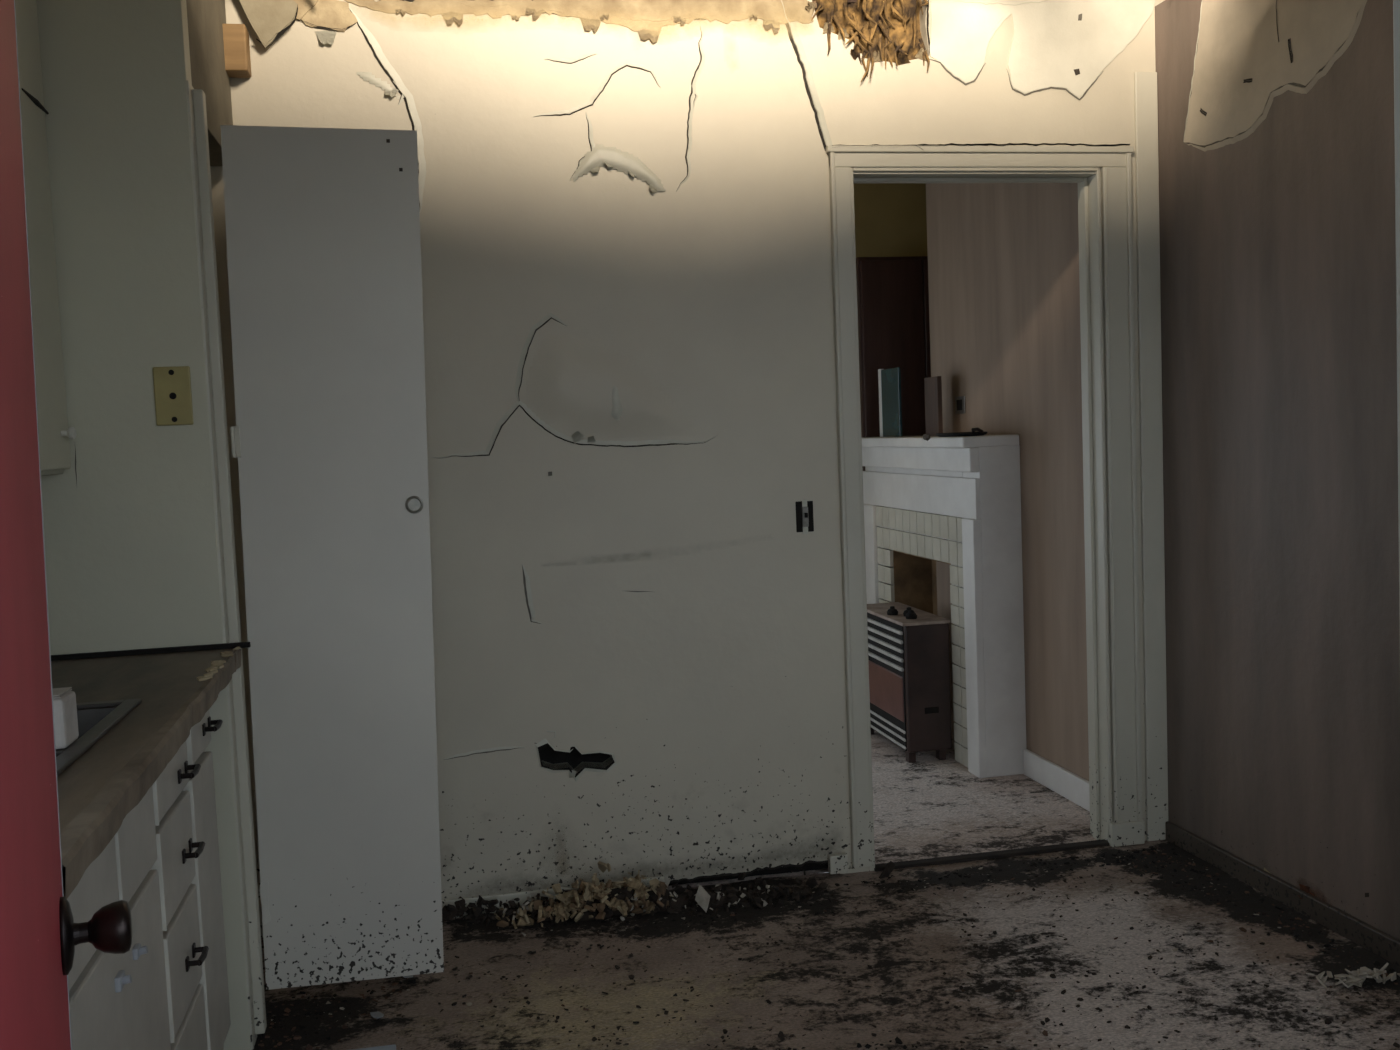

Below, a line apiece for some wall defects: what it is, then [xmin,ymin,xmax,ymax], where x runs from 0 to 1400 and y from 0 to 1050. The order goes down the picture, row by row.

crack [534,15,707,192]
peeling [239,0,1155,100]
crack [781,0,1130,155]
crack [432,313,716,458]
hole [536,739,617,781]